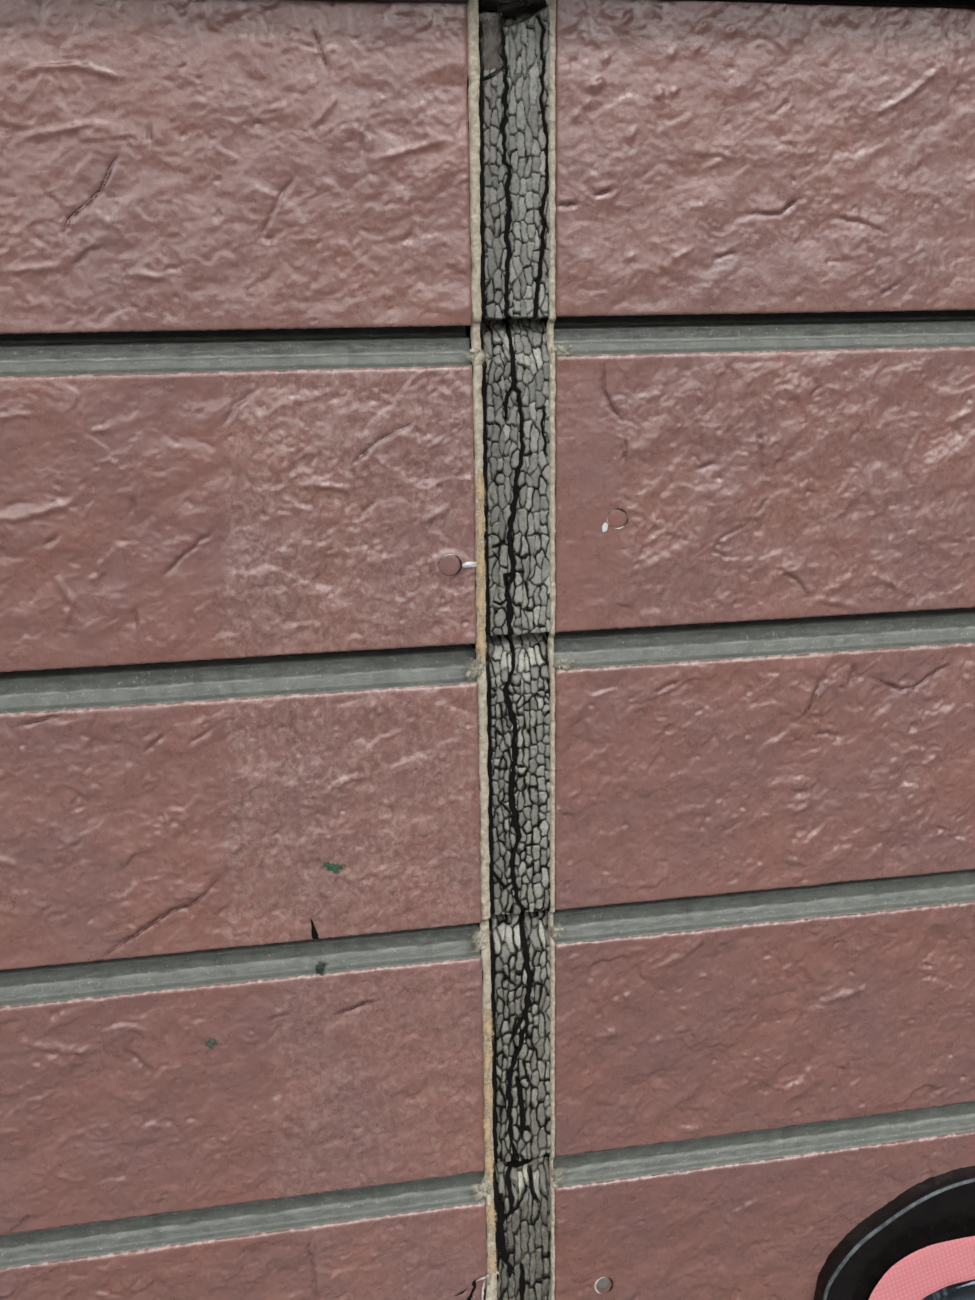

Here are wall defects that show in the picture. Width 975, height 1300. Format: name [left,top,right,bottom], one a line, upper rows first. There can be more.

crack [63,157,117,232]
crack [353,422,413,464]
crack [479,10,613,1300]
crack [19,713,58,726]
crack [104,884,214,956]
crack [337,997,377,1015]
peeling [455,1271,499,1300]